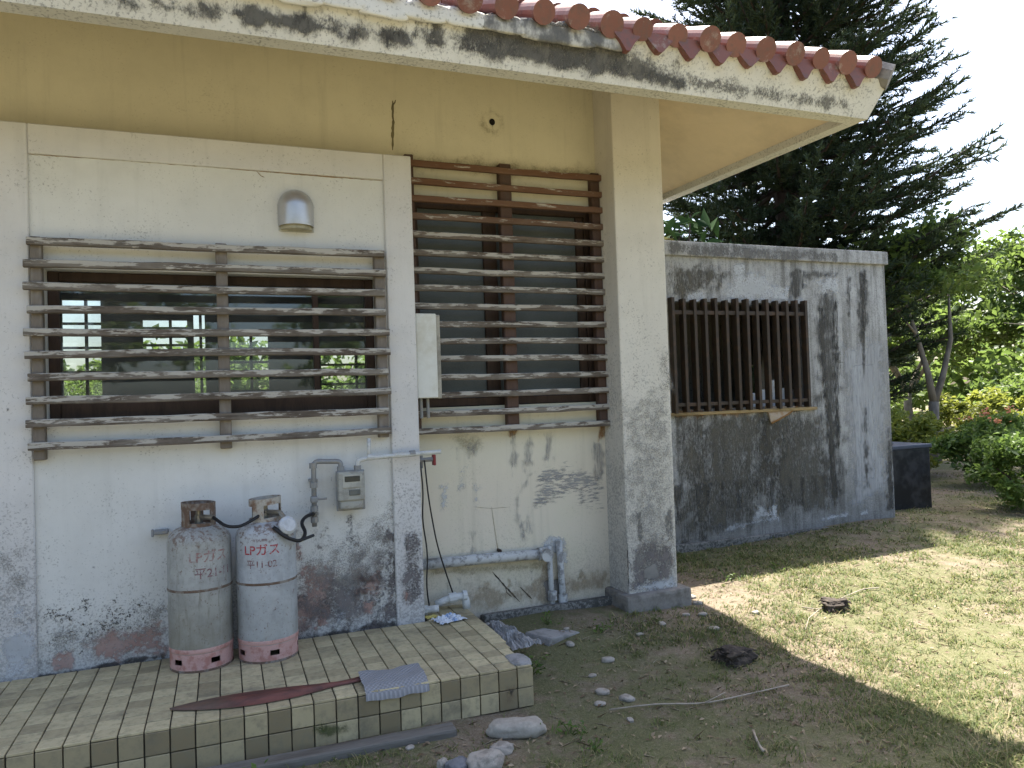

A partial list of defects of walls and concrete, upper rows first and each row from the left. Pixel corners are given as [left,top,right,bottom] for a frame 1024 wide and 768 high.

damp [153,0,847,109]
crack [389,100,397,150]
damp [669,241,838,299]
damp [628,270,868,590]
damp [535,444,603,508]
damp [297,515,423,632]
damp [38,597,159,655]